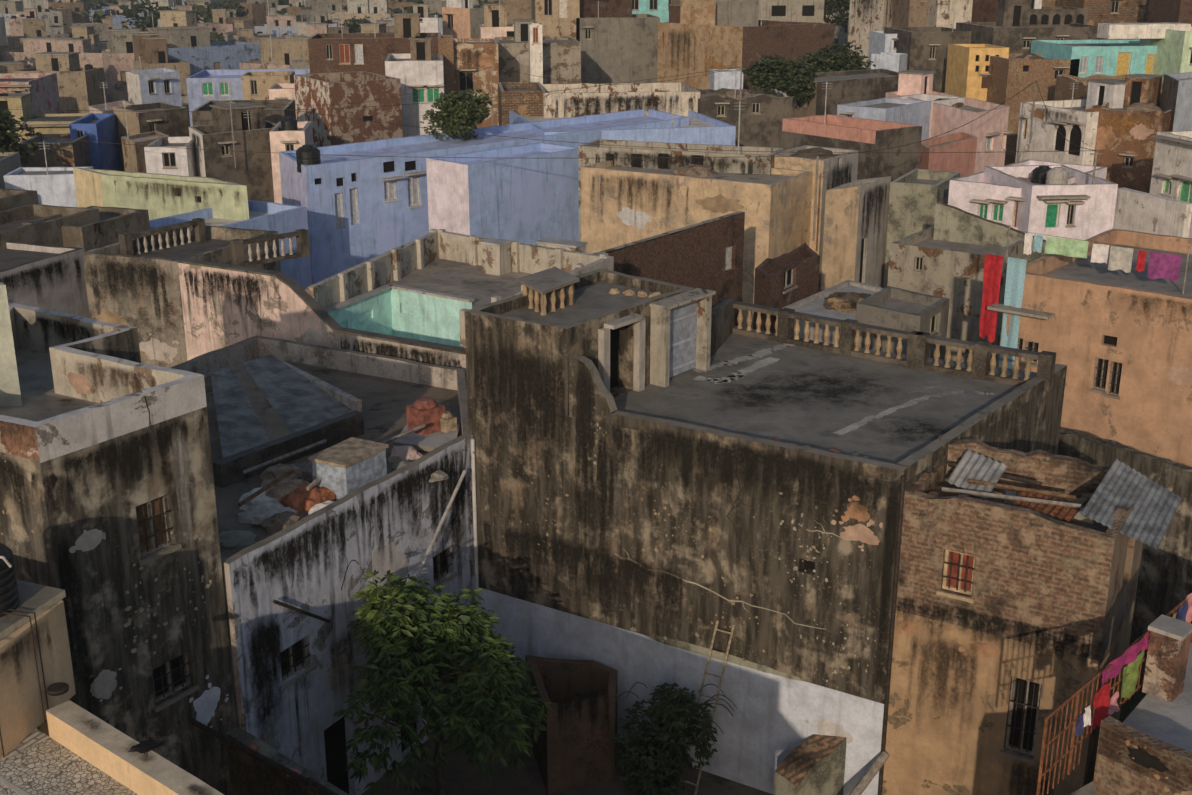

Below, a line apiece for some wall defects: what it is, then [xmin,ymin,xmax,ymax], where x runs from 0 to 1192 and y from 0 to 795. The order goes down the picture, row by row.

damp [340,341,462,368]
damp [0,415,203,538]
peeling [69,529,106,553]
damp [234,450,491,606]
damp [475,353,1103,697]
peeling [778,489,883,596]
peeling [90,668,123,702]
peeling [124,564,168,654]
peeling [189,675,229,728]
damp [249,622,282,725]
peeling [814,602,876,685]